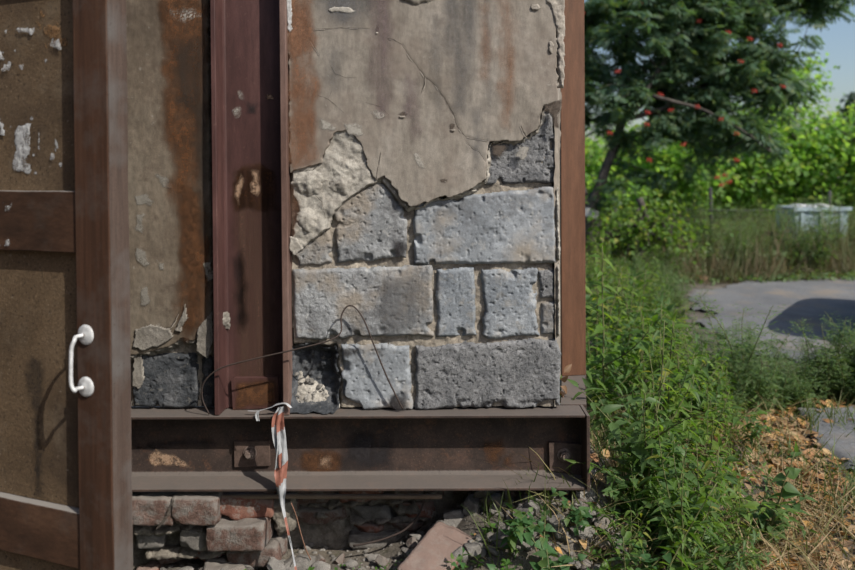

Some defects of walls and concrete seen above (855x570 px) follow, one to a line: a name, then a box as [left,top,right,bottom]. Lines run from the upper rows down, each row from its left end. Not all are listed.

crack [311,27,488,162]
peeling [0,117,40,174]
rust [162,0,209,331]
flaking render [289,110,546,256]
spalling [131,304,231,389]
spalling [290,343,341,414]
rust [150,452,186,466]
rust [303,453,340,472]